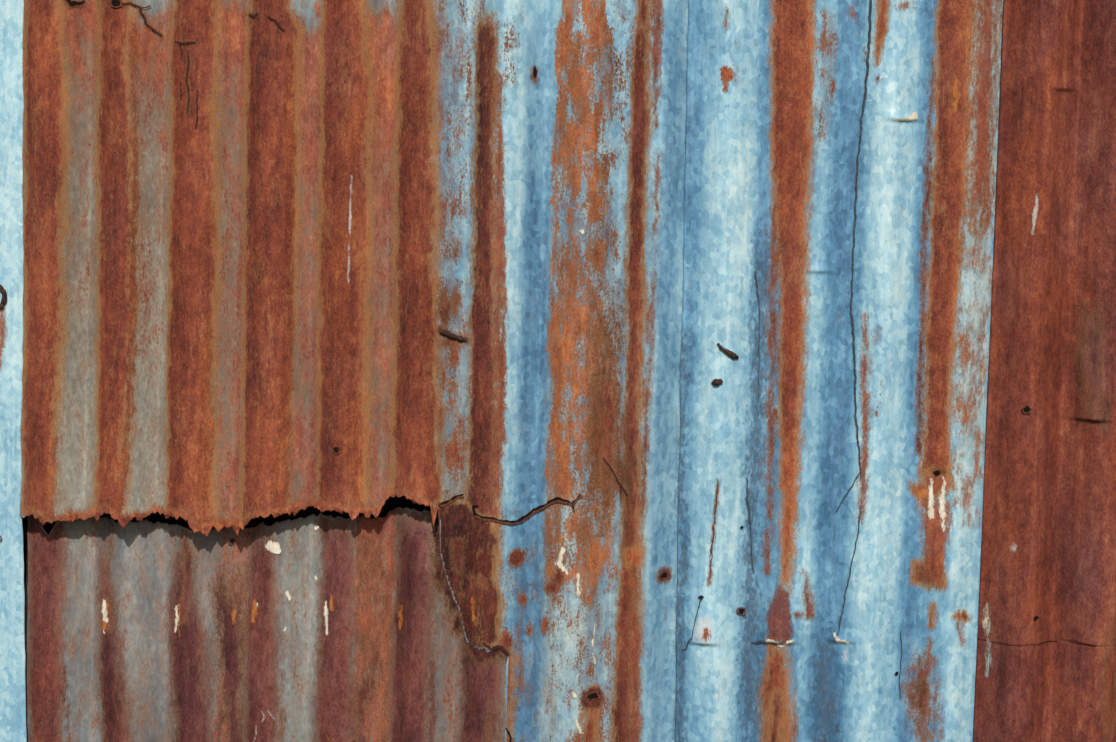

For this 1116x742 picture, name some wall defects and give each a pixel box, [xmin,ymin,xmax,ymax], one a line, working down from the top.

corrosion [20,0,73,742]
corrosion [92,0,140,742]
corrosion [164,0,305,742]
corrosion [313,0,664,742]
crack [481,641,512,656]
corrosion [657,566,672,583]
corrosion [755,0,909,742]
crack [836,0,872,635]
corrosion [901,0,1004,742]